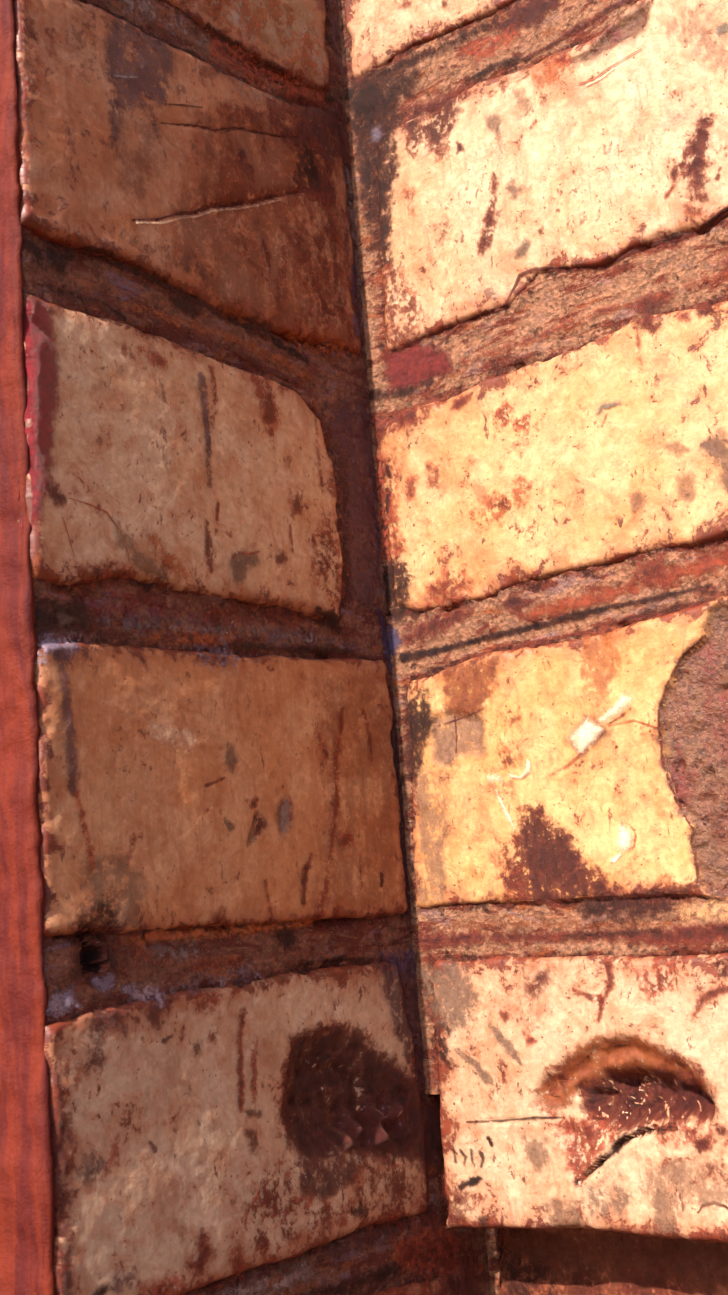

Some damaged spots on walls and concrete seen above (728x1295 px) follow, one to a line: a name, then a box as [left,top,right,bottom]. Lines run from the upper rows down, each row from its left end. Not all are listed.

corrosion [664,112,721,216]
crack [132,184,301,224]
water stain [681,900,728,918]